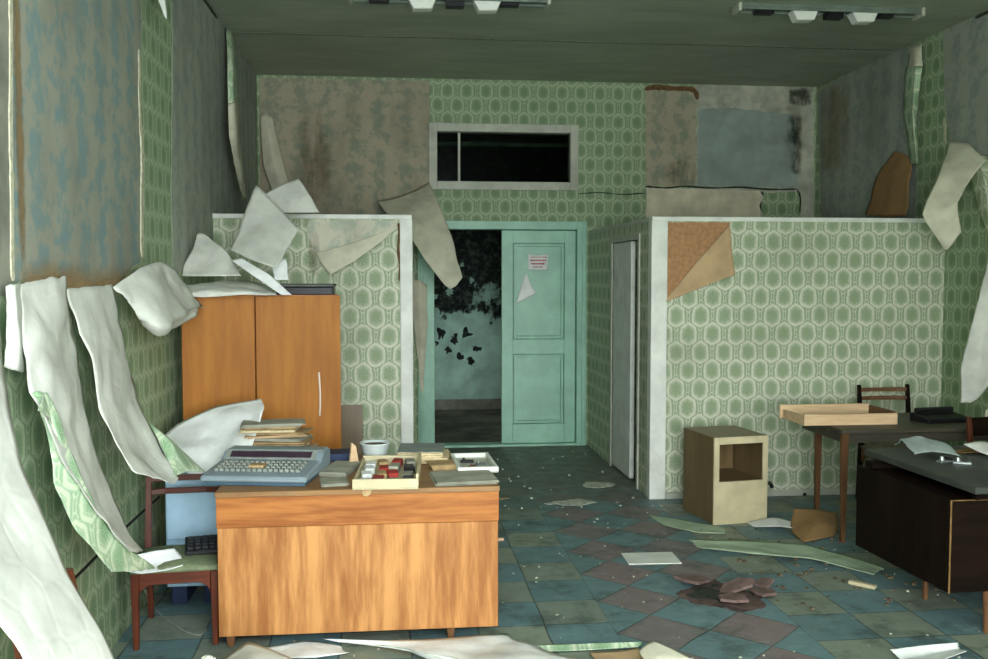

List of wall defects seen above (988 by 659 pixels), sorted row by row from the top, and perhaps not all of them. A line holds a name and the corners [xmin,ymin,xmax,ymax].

flaking render [0,0,15,296]
flaking render [696,85,814,218]
leakage [789,118,801,162]
leakage [790,89,809,104]